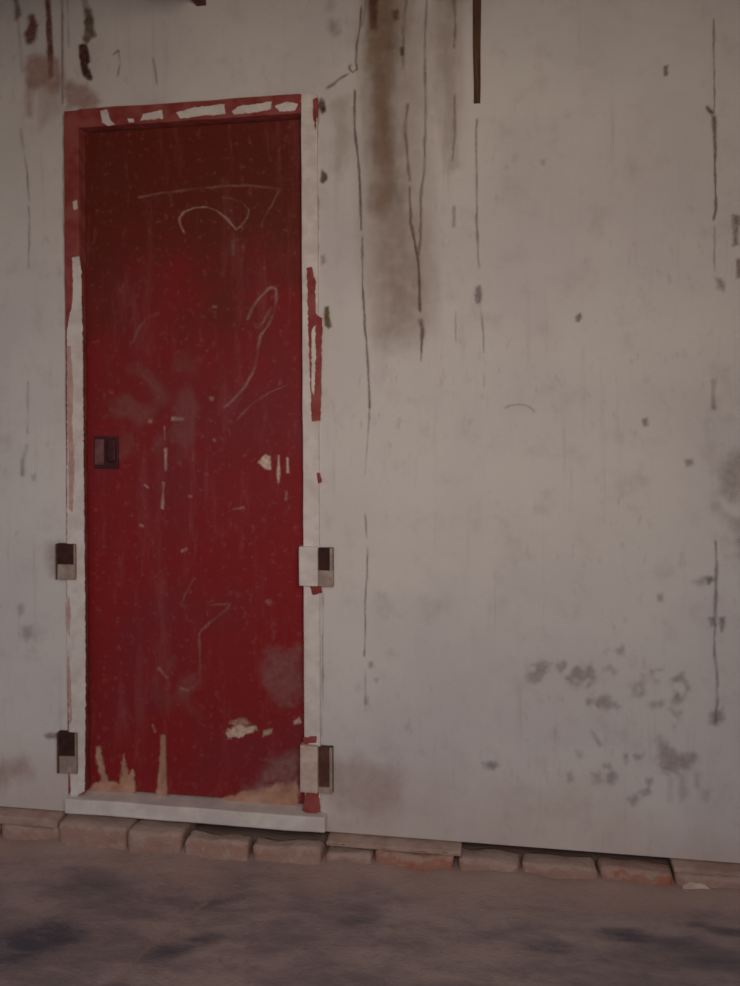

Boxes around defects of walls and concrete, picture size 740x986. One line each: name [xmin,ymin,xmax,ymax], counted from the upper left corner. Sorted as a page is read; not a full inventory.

crack [708,567,724,624]